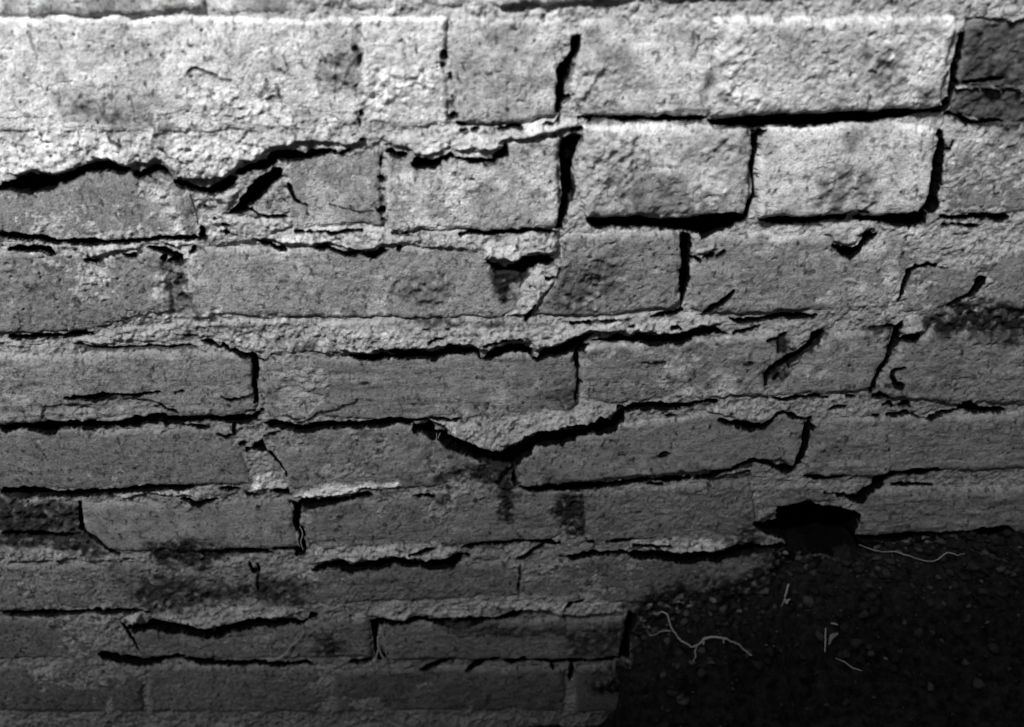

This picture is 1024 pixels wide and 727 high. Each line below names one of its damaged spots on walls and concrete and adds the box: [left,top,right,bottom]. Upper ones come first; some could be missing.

crack [385,143,509,170]
crack [0,136,374,254]
crack [831,201,877,260]
crack [315,243,402,259]
crack [897,262,949,301]
crack [946,275,986,307]
crack [72,334,199,351]
crack [63,389,184,413]
crack [871,366,1005,421]
spalling [756,506,777,521]
crack [311,538,782,574]
crack [119,612,318,654]